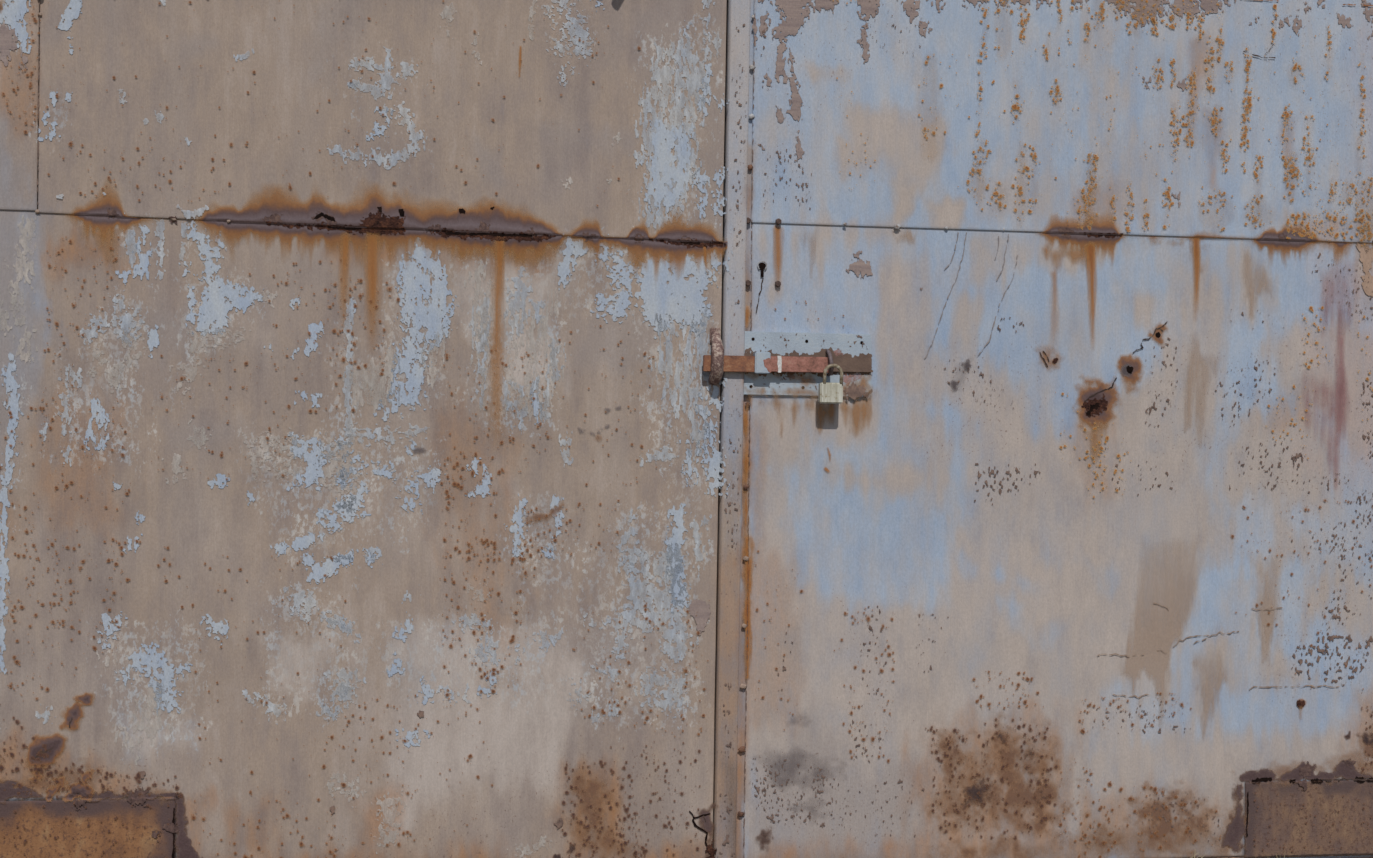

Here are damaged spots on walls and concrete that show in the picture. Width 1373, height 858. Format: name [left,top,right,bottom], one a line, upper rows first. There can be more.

peeling [0,0,32,69]
peeling [1249,0,1373,40]
peeling [0,215,38,674]
rust [0,383,89,499]
rust [7,490,141,700]
rust [44,132,248,365]
peeling [39,204,263,467]
peeling [116,642,193,715]
rust [188,170,728,806]
peeling [242,0,839,748]
rust [918,0,1373,329]
rust [925,671,1373,858]